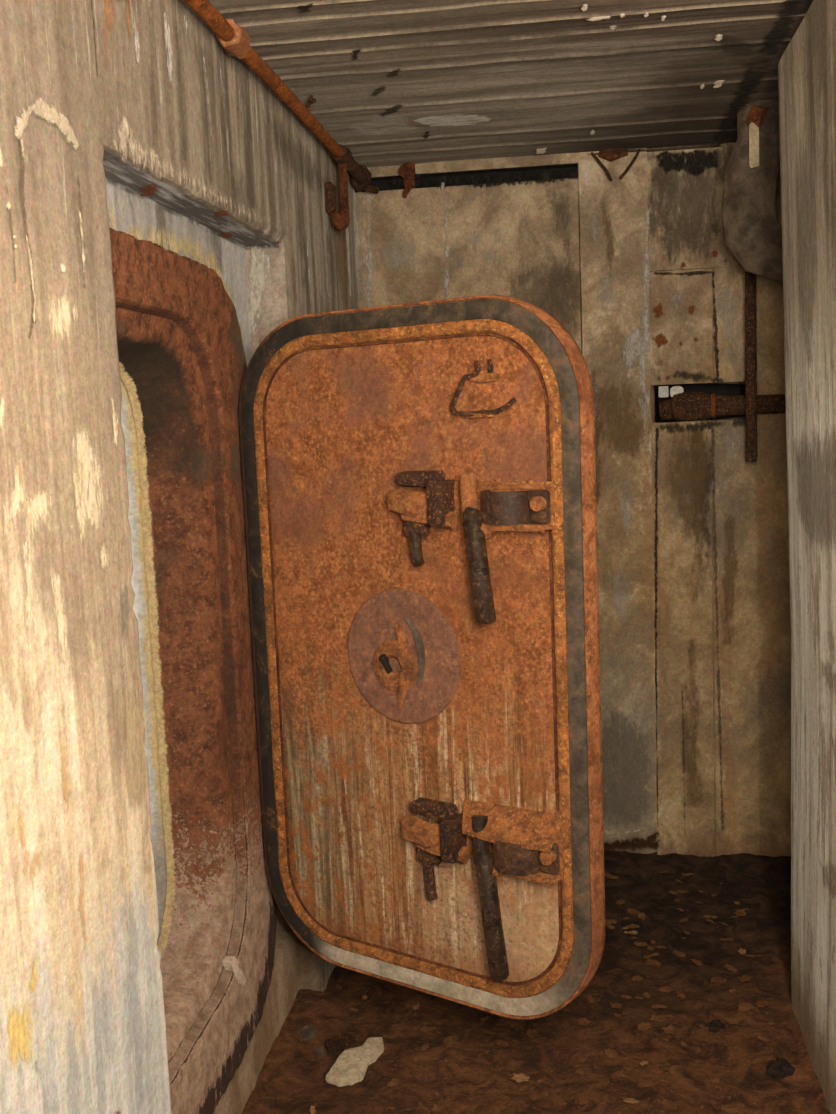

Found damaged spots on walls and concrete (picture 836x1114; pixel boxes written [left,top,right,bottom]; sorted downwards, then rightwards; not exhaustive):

rust [141,184,161,196]